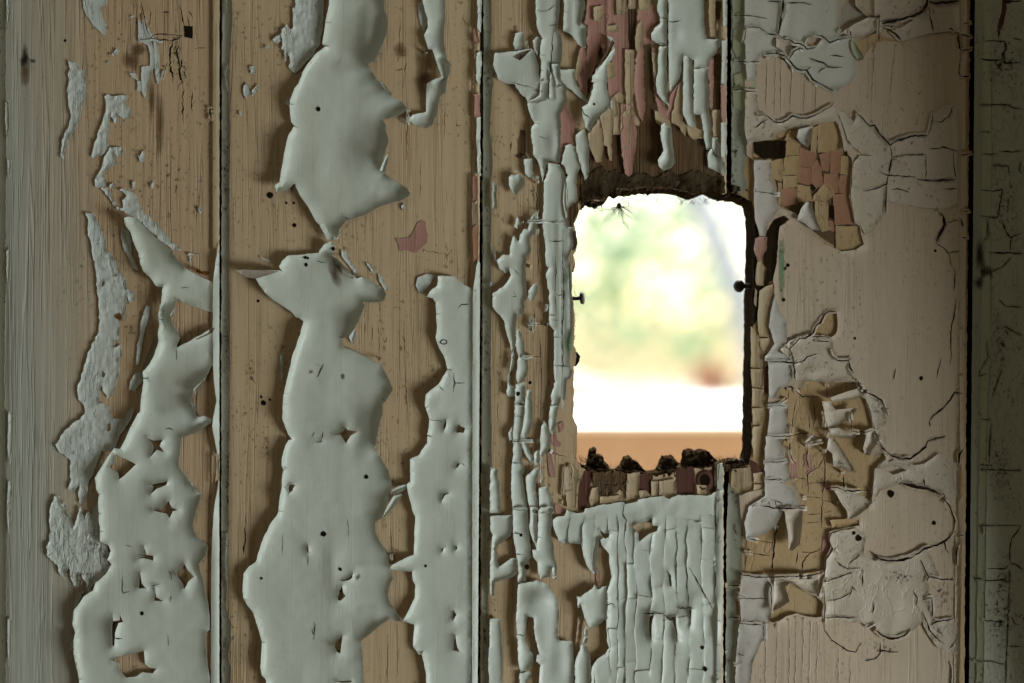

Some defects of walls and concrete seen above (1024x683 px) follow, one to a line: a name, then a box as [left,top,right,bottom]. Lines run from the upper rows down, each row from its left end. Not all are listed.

peeling [46,0,233,683]
peeling [236,0,968,683]
crack [591,0,1024,683]